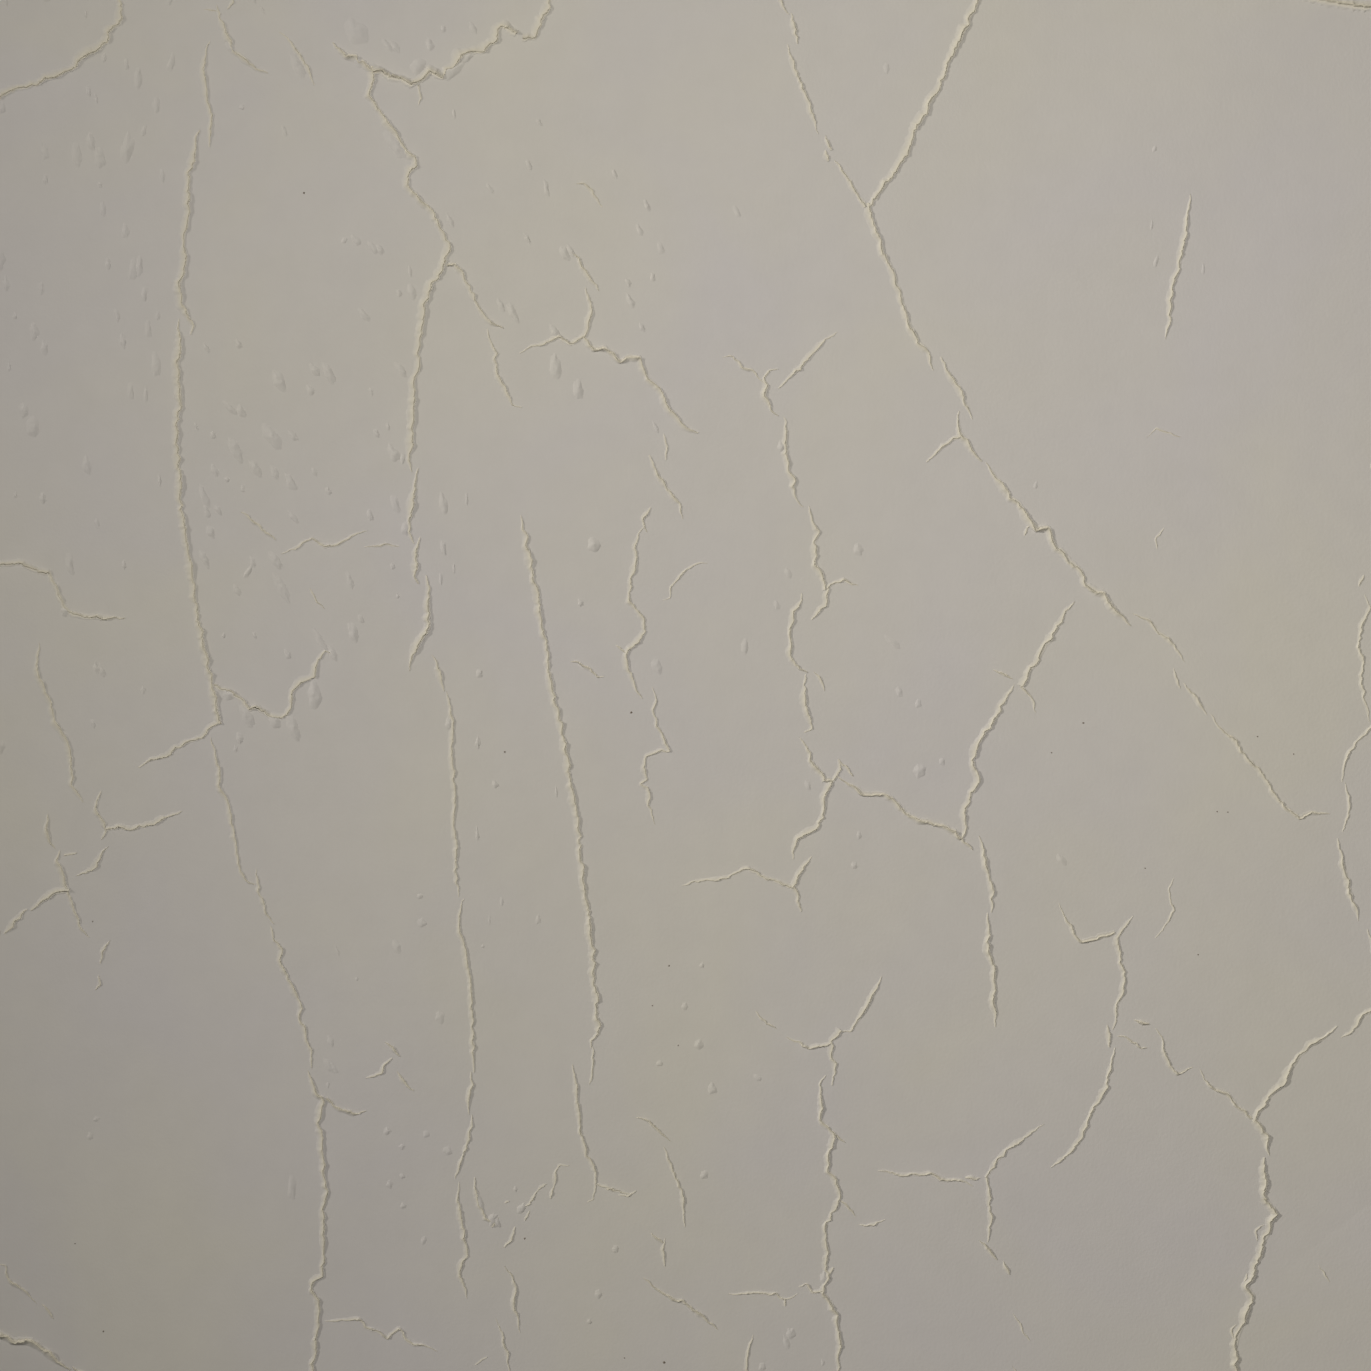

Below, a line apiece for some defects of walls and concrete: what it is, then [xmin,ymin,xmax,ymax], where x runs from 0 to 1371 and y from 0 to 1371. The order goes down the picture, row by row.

crack [0,0,123,113]
crack [0,558,125,621]
crack [138,0,437,1371]
crack [241,0,707,1299]
crack [682,0,1371,1027]
crack [4,791,182,990]
crack [0,1264,83,1371]
crack [474,1266,520,1371]
crack [636,1117,718,1330]
crack [730,976,886,1371]
crack [878,1124,1045,1275]
crack [1051,878,1371,1371]